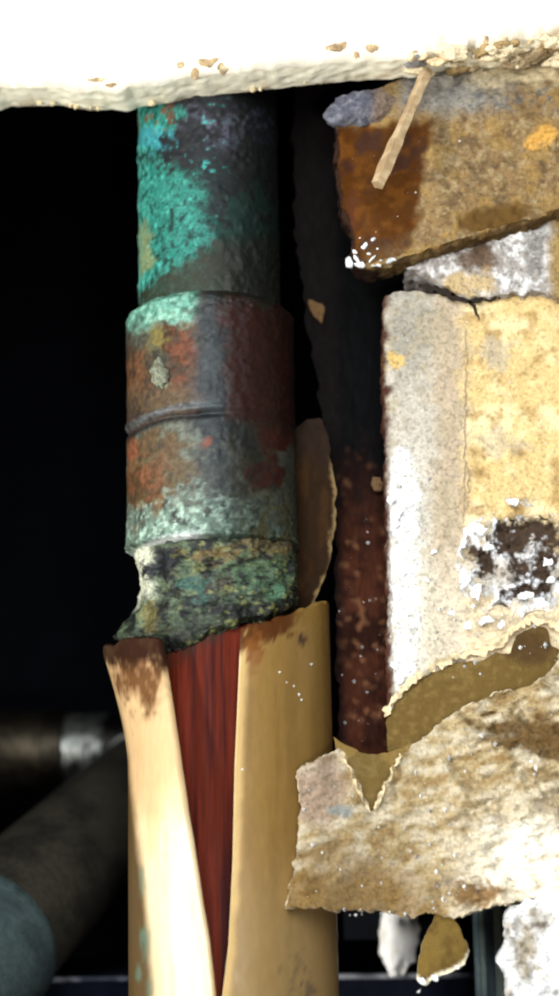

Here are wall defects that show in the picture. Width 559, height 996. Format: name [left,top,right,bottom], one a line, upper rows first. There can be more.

crack [418,283,501,524]
peeling [334,496,559,811]
spalling [495,890,559,996]